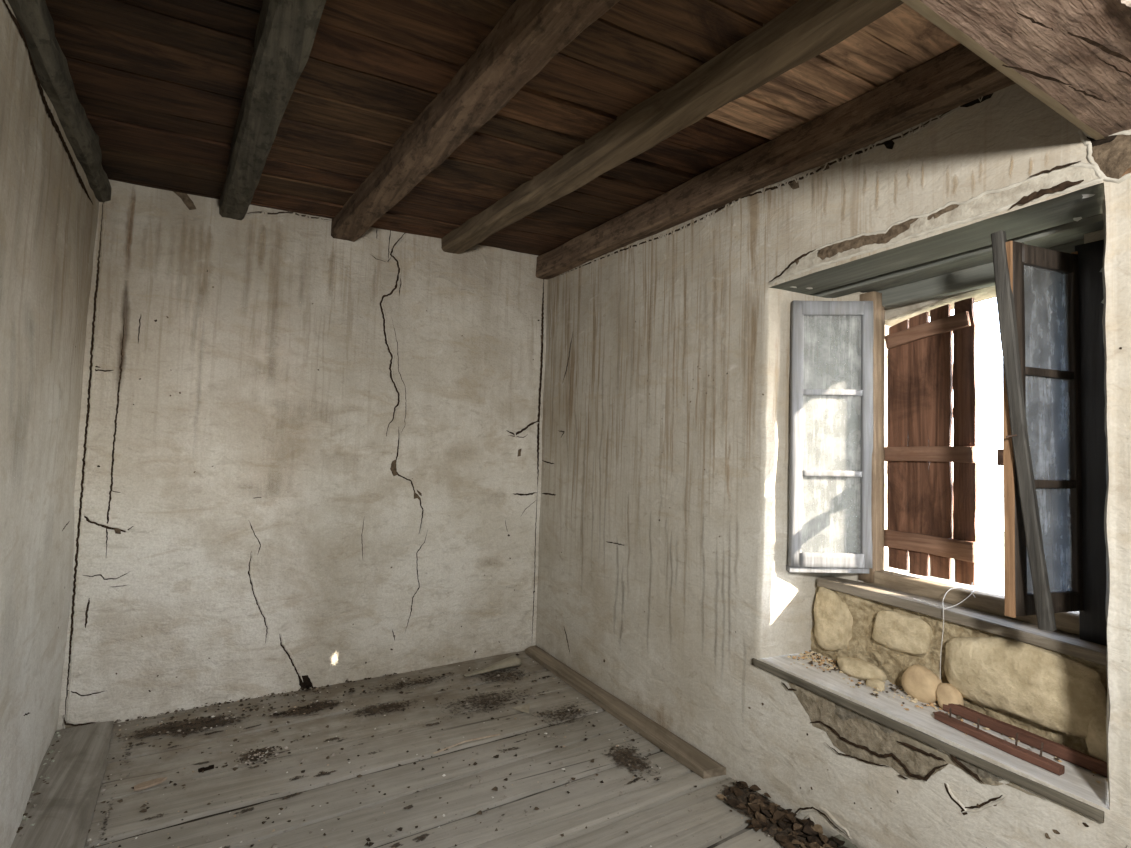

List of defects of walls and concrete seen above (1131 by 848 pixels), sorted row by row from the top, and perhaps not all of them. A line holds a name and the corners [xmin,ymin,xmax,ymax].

flaking render [559,93,993,276]
flaking render [769,129,1131,289]
crack [3,0,135,720]
crack [371,230,427,632]
crack [248,521,313,690]
flaking render [781,681,1045,800]